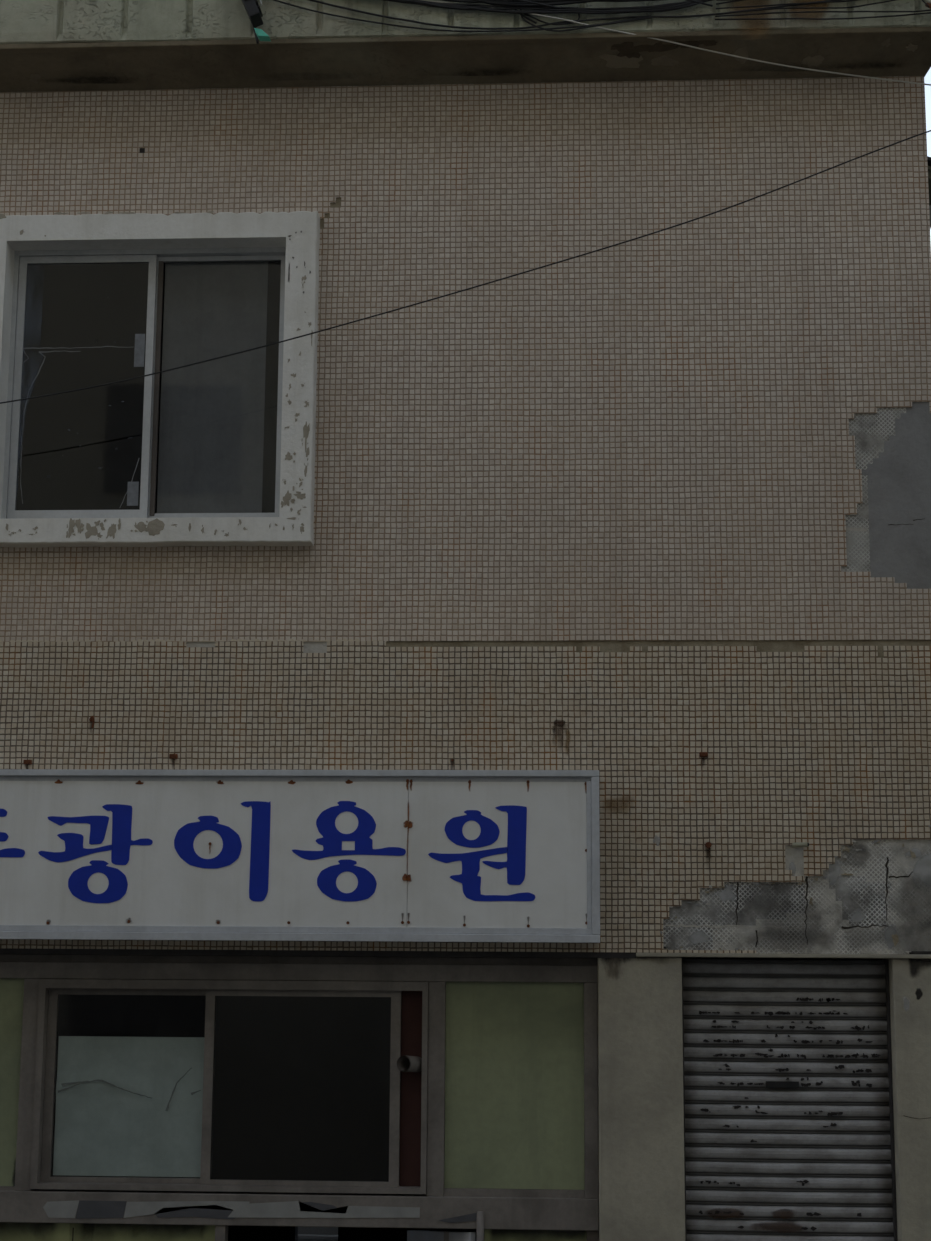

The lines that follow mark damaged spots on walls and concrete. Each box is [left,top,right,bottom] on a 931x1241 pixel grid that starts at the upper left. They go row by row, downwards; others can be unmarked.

peeling [66,518,247,539]
spalling [660,825,931,954]
corrosion [706,1209,802,1232]